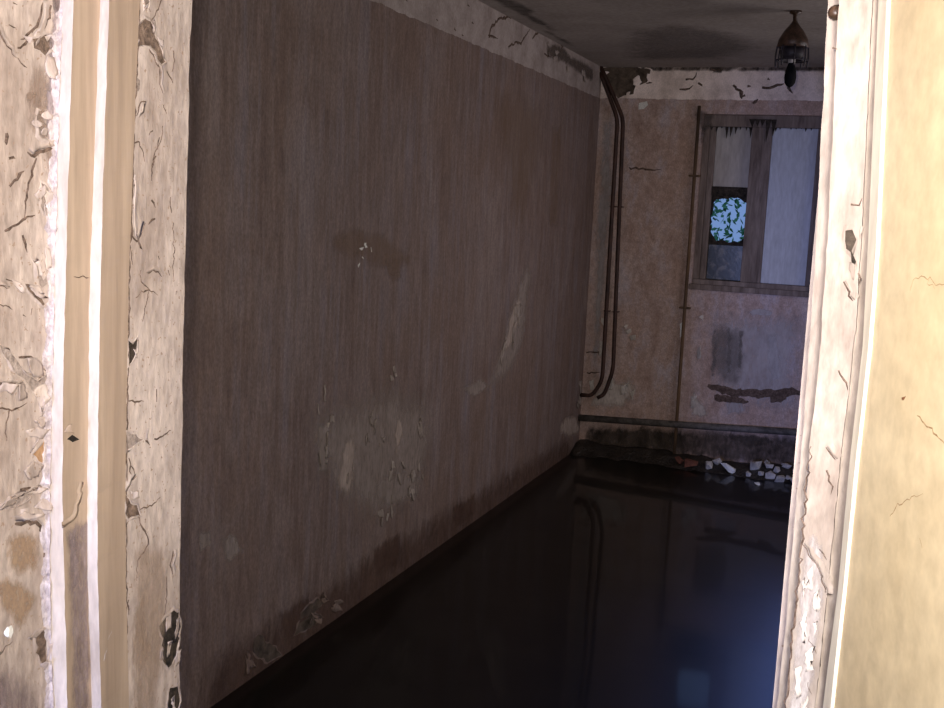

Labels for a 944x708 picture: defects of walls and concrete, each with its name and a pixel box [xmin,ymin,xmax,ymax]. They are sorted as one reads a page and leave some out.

spalling [23,31,59,80]
spalling [138,0,167,69]
peeling [32,108,55,144]
peeling [12,246,52,309]
spalling [127,333,139,369]
water stain [713,309,794,404]
peeling [0,345,53,520]
crack [784,443,842,708]
peeling [28,626,53,670]
spalling [158,606,182,671]
peeling [790,536,822,708]
spalling [165,683,182,708]